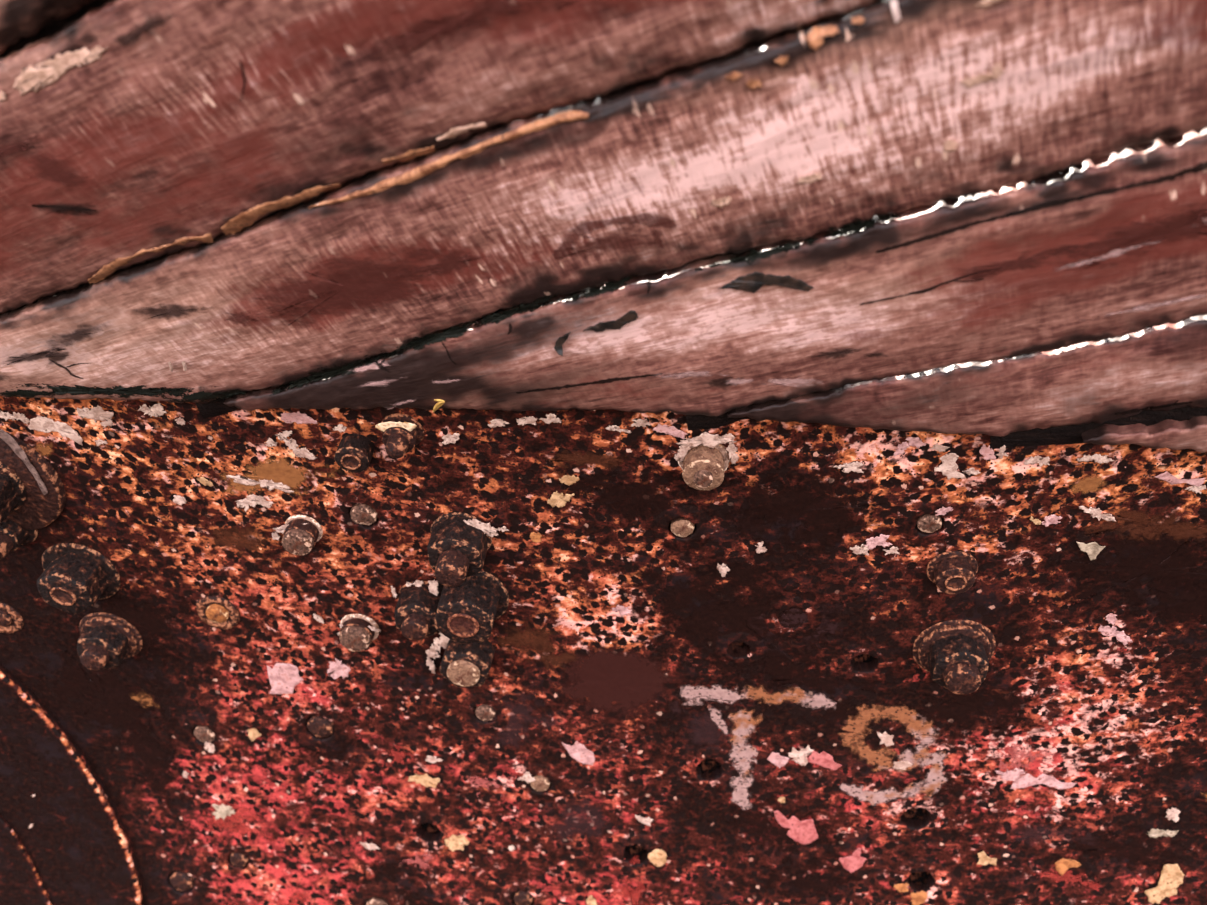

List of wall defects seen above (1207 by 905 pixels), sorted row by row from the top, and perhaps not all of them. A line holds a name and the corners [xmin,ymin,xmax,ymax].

crack [876,162,1207,253]
crack [860,269,993,305]
peeling [488,413,561,428]
peeling [0,405,114,495]
rust [220,457,336,495]
peeling [894,437,1008,480]
peeling [849,534,900,555]
rust [898,687,1046,739]
rust [899,770,994,799]
rust [730,795,861,903]
rust [1047,824,1191,871]
peeling [1145,864,1184,904]